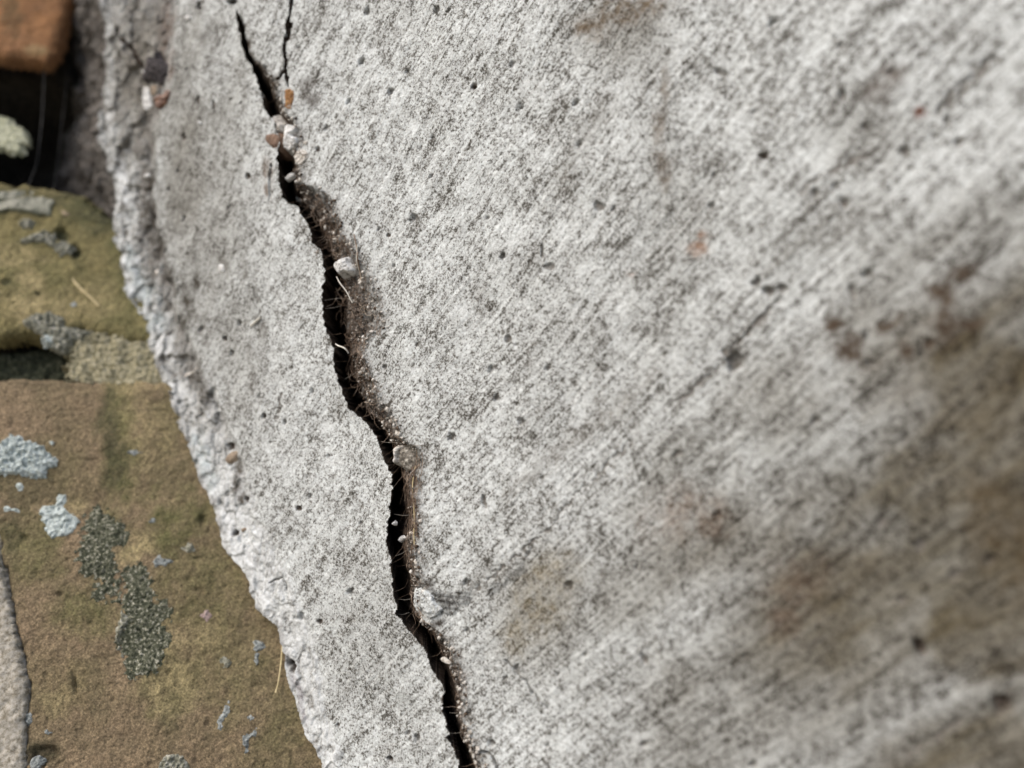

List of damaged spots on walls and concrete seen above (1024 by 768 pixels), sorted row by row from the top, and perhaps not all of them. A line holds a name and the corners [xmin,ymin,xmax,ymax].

crack [236,0,499,768]